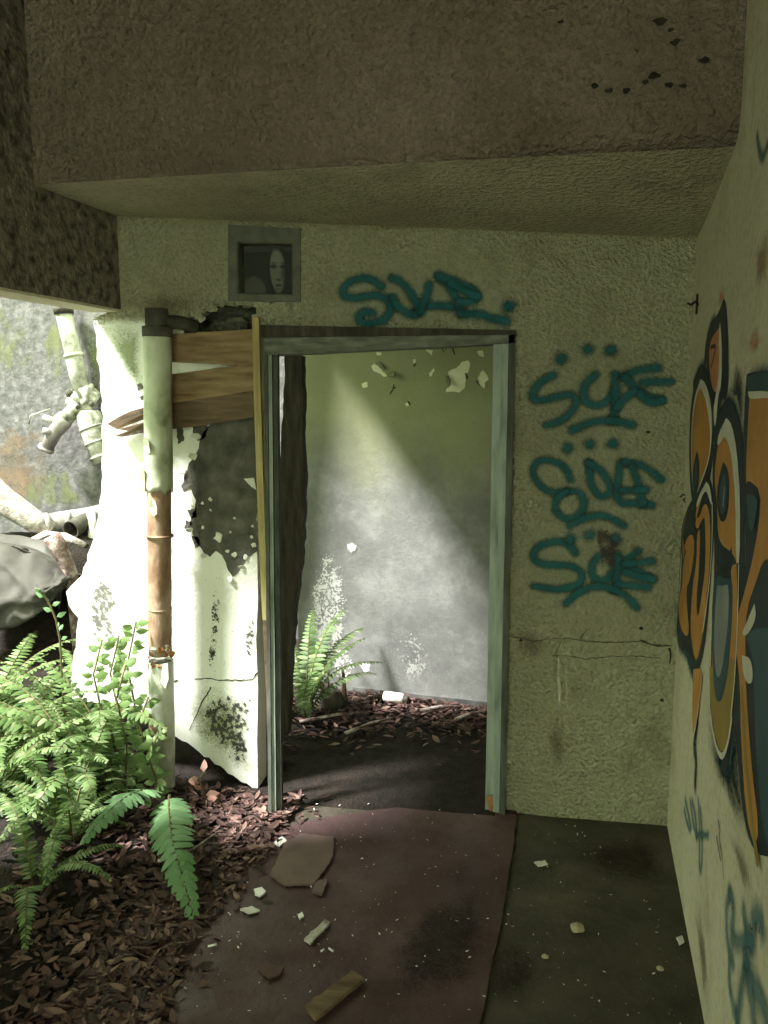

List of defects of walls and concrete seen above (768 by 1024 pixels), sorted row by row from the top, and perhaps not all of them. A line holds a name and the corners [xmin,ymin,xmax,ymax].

flaking render [184,302,260,333]
peeling [371,352,395,377]
peeling [429,351,489,392]
peeling [177,417,258,583]
rust [146,489,172,658]
damp [308,544,357,677]
crack [511,629,672,664]
crack [174,672,258,731]
damp [199,696,251,762]